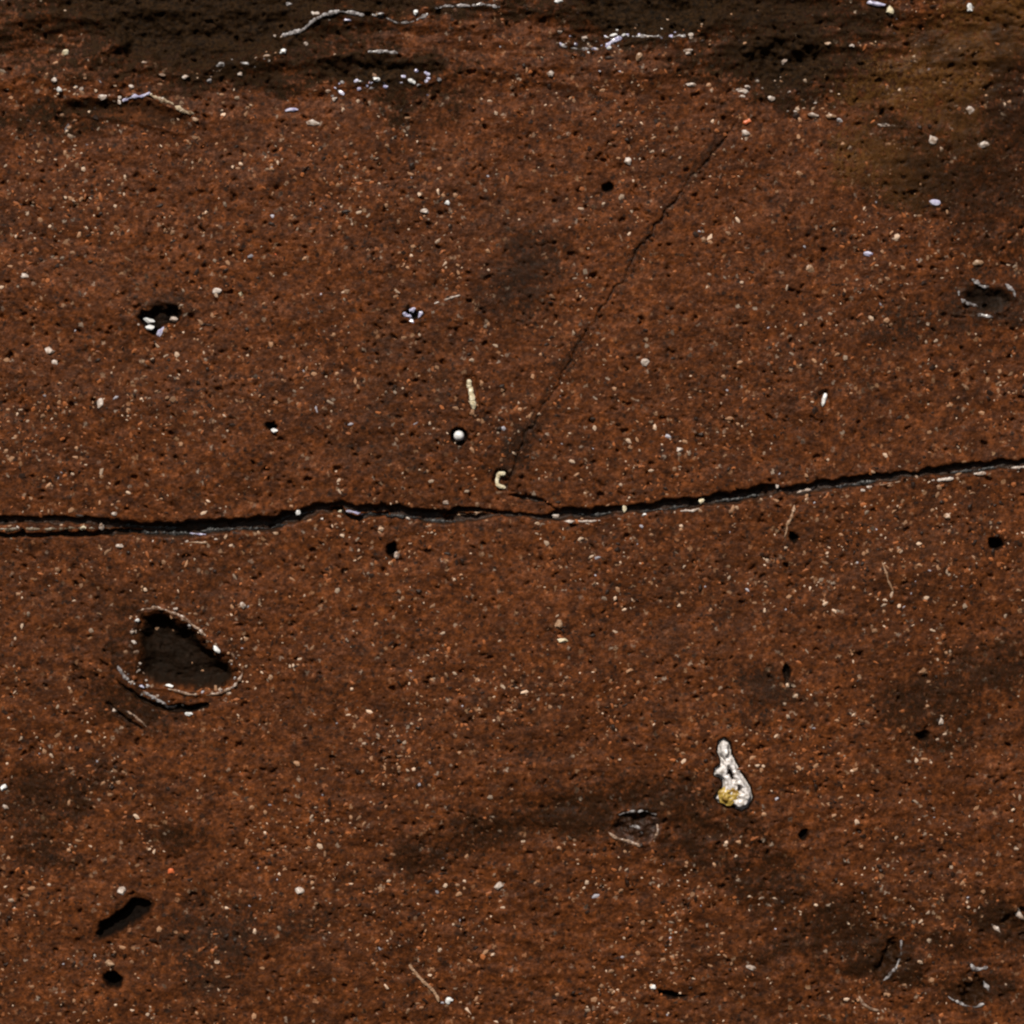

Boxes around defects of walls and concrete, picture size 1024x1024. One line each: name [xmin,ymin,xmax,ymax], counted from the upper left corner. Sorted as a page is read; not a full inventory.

crack [0,124,1024,548]
spalling [108,702,147,730]
spalling [117,606,243,716]